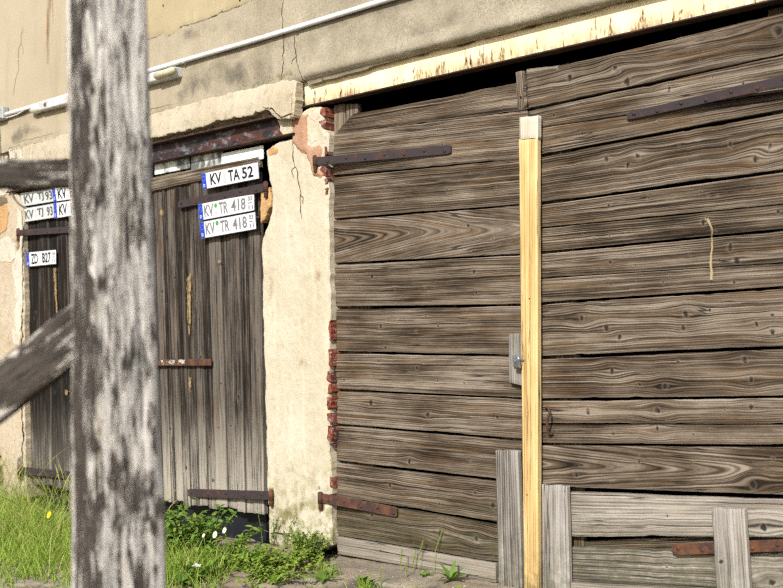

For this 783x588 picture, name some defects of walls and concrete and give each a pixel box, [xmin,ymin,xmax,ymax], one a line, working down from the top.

crack [281,3,307,83]
flaking render [319,107,334,131]
crack [291,142,304,218]
flaking render [320,166,336,195]
flaking render [326,320,342,446]